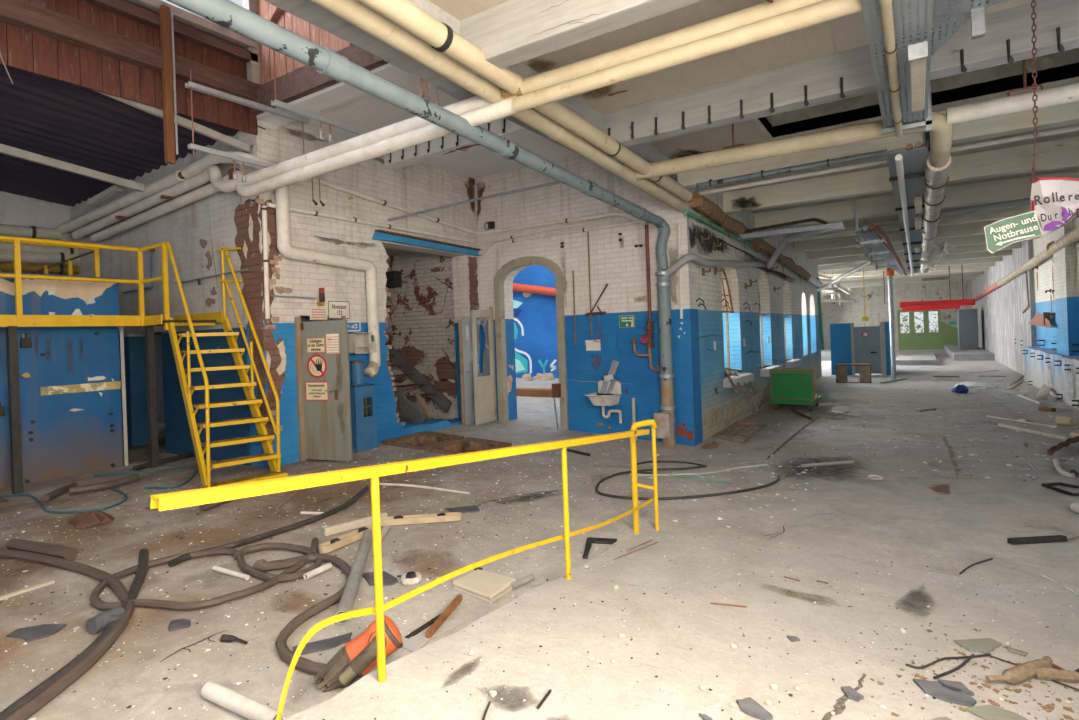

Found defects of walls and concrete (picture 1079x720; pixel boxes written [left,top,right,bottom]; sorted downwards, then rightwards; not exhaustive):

water stain [689,226,727,254]
peeling [0,278,115,315]
flaking render [234,196,292,448]
flaking render [468,257,479,312]
flaking render [383,287,457,426]
spalling [377,425,524,464]
peeling [641,423,816,528]
crack [822,675,867,720]